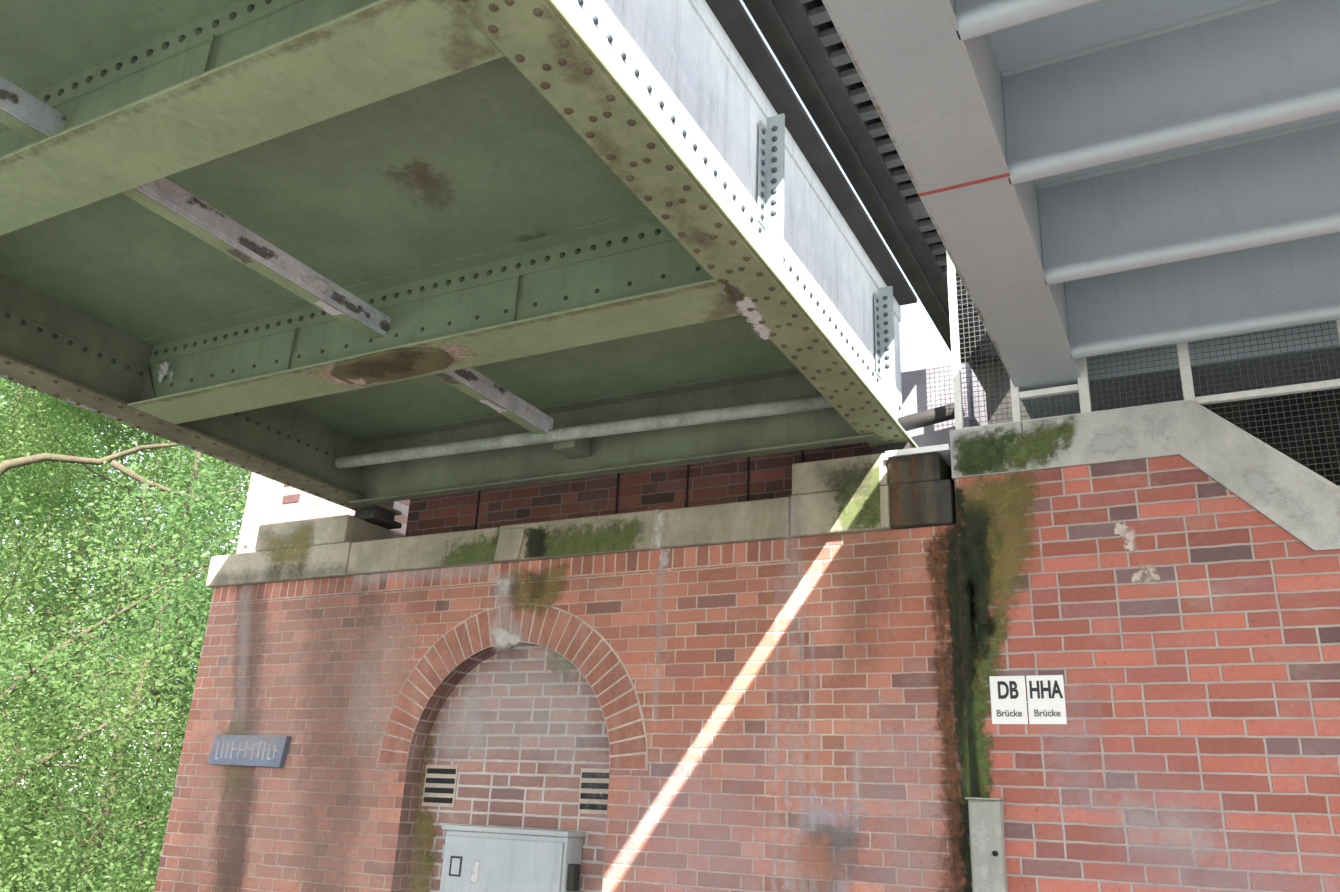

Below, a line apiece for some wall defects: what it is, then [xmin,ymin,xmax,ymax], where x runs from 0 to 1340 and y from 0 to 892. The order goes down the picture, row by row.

peeling [0,89,19,103]
peeling [227,236,278,264]
peeling [315,291,390,332]
peeling [718,279,771,340]
corrosion [308,343,473,387]
leakage [525,528,545,558]